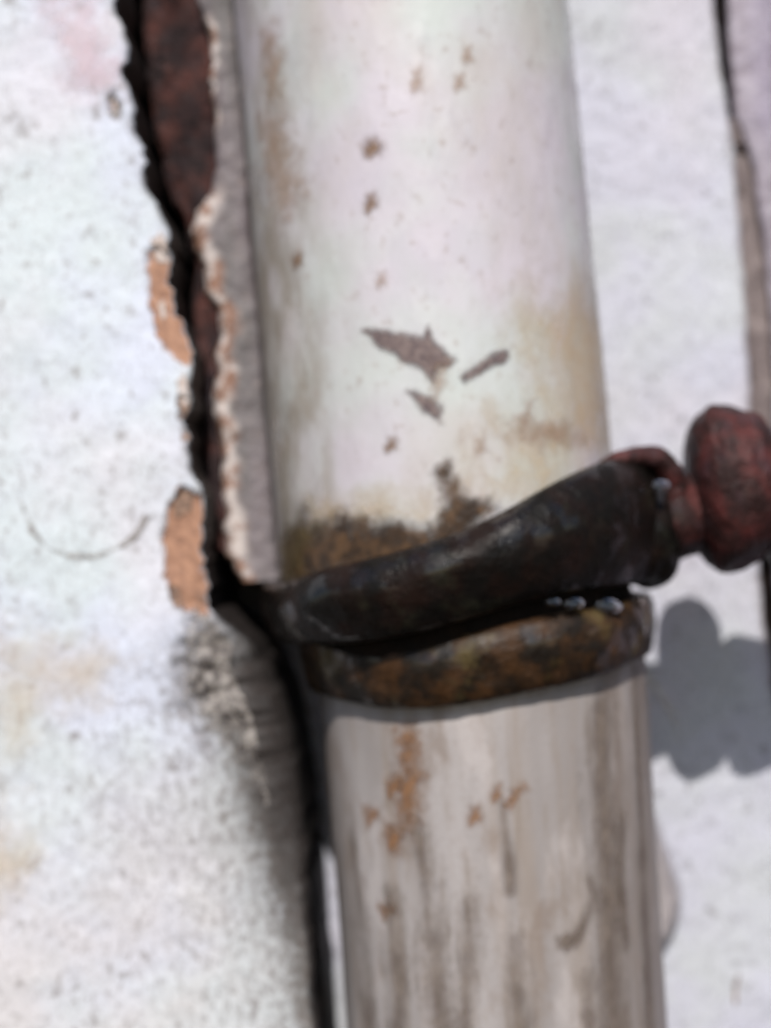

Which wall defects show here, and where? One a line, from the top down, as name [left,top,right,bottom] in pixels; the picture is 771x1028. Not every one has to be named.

peeling [106,95,121,121]
spalling [145,232,192,442]
crack [728,118,771,429]
crack [759,559,771,656]